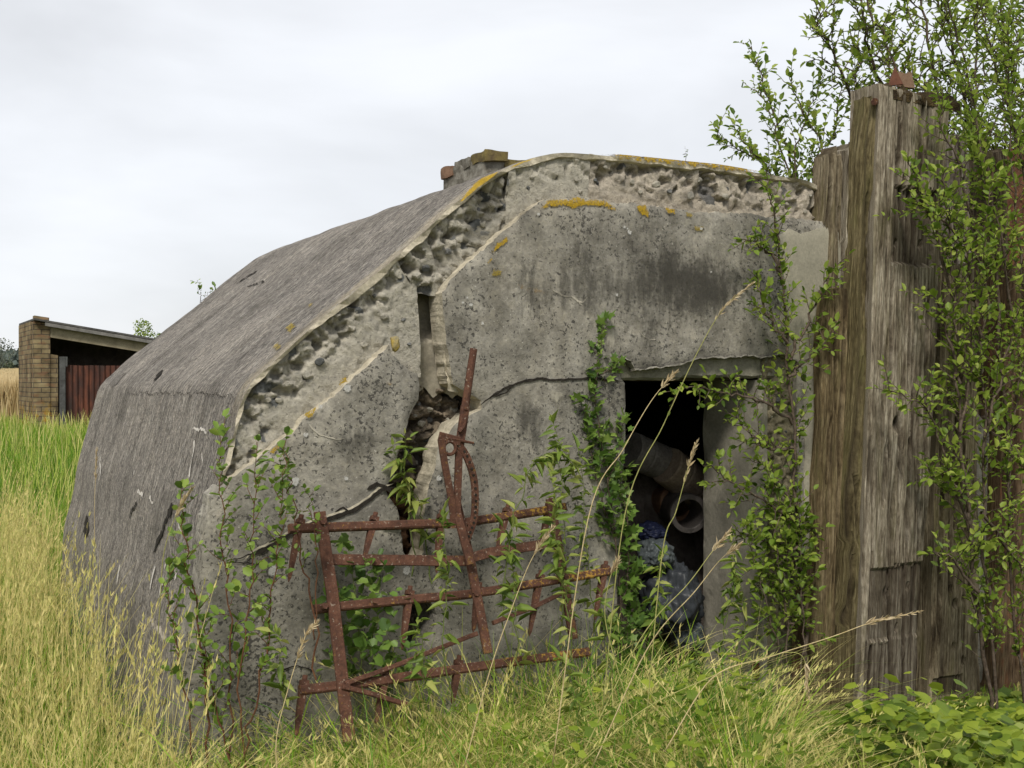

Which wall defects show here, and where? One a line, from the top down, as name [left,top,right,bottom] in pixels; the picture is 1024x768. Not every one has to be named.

crack [481,373,623,405]
spalling [225,154,841,712]
crack [233,482,401,565]